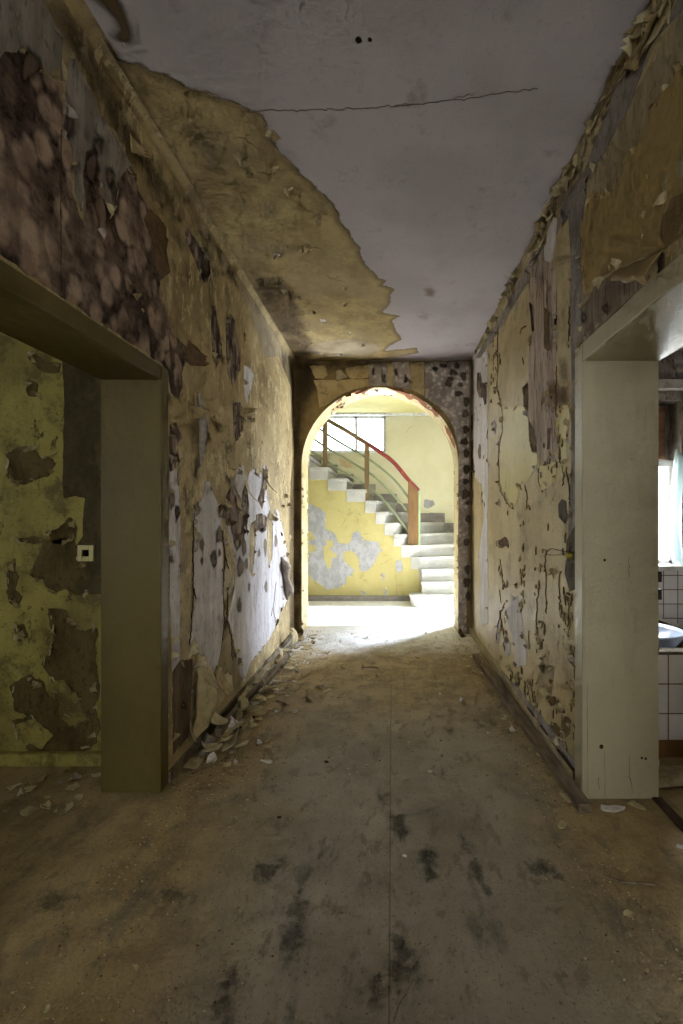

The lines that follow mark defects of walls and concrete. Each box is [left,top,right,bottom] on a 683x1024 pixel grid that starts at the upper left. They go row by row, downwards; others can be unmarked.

crack [259,88,537,112]
damp [0,36,187,399]
peeling [144,210,170,278]
peeling [185,225,211,283]
peeling [653,171,683,247]
peeling [471,0,672,780]
peeling [168,304,404,754]